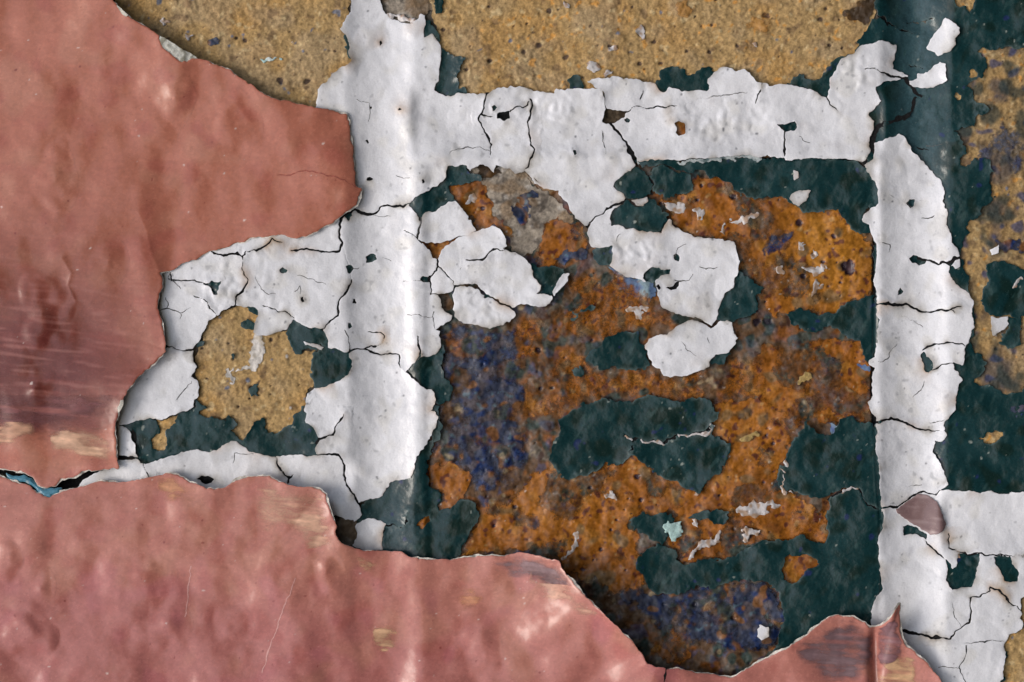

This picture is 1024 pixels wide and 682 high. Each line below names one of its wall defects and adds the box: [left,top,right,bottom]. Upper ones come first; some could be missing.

crack [449,92,535,169]
crack [602,90,675,195]
crack [862,66,923,164]
crack [160,170,439,382]
peeling [0,0,908,521]
crack [917,256,960,265]
crack [876,301,965,395]
crack [315,414,360,506]
corrosion [417,156,874,676]
crack [876,417,944,432]
peeling [0,472,941,682]
crack [902,586,1022,682]